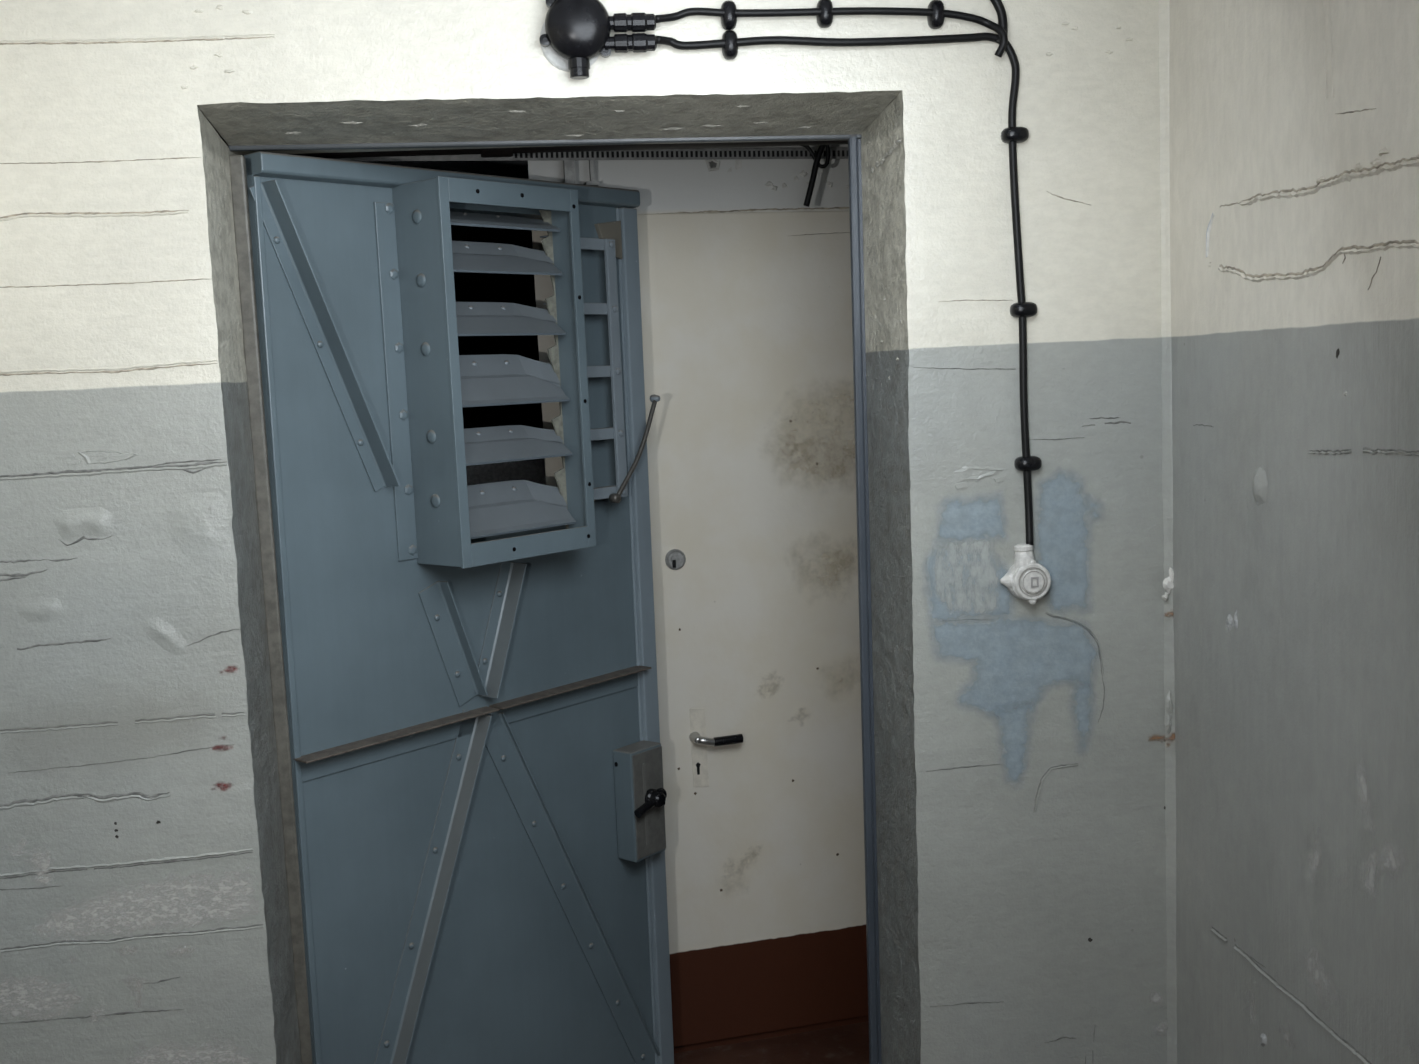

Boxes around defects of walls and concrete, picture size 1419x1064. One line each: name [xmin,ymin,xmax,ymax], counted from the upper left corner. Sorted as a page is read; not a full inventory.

crack [1206,157,1419,289]
crack [1210,927,1372,1064]